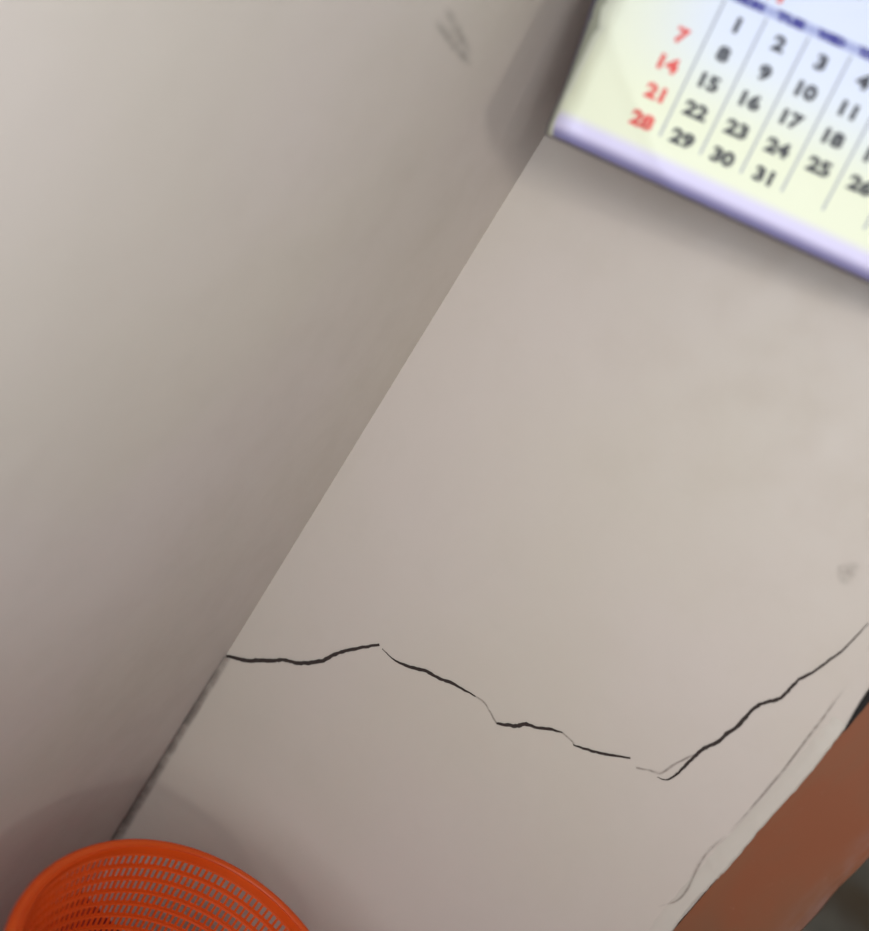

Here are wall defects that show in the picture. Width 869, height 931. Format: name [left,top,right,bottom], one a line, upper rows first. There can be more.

crack [226,644,475,697]
crack [657,623,869,780]
crack [496,722,630,759]